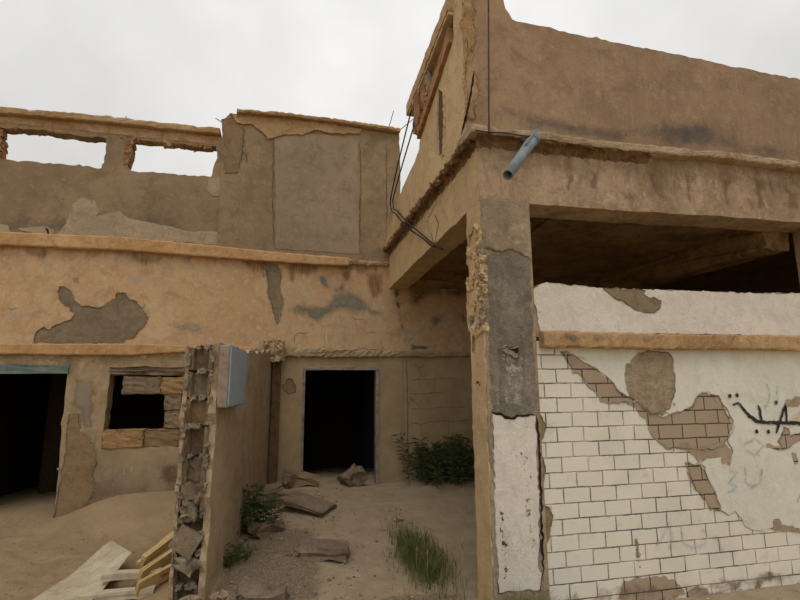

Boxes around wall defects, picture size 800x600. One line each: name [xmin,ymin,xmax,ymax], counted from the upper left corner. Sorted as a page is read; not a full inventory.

peeling [33,286,149,344]
peeling [264,264,284,324]
spalling [465,223,489,351]
peeling [603,287,662,313]
spalling [624,350,676,416]
peeling [784,396,800,407]
peeling [53,413,98,518]
peeling [766,426,800,464]
crack [492,412,544,594]
peeling [619,576,712,600]